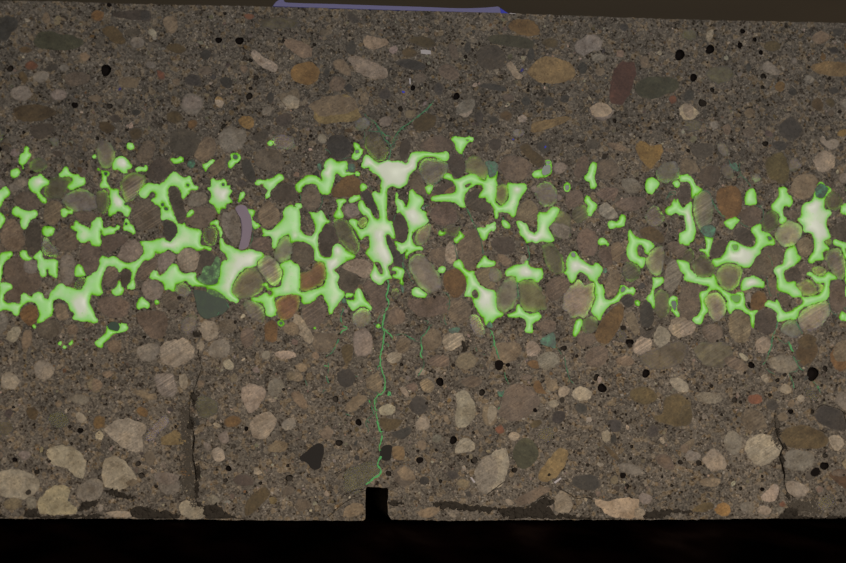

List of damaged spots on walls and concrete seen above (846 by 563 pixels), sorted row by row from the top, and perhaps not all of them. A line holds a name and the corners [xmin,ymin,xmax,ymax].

crack [363,100,434,160]
crack [189,350,202,481]
crack [327,257,450,518]
crack [774,415,795,498]